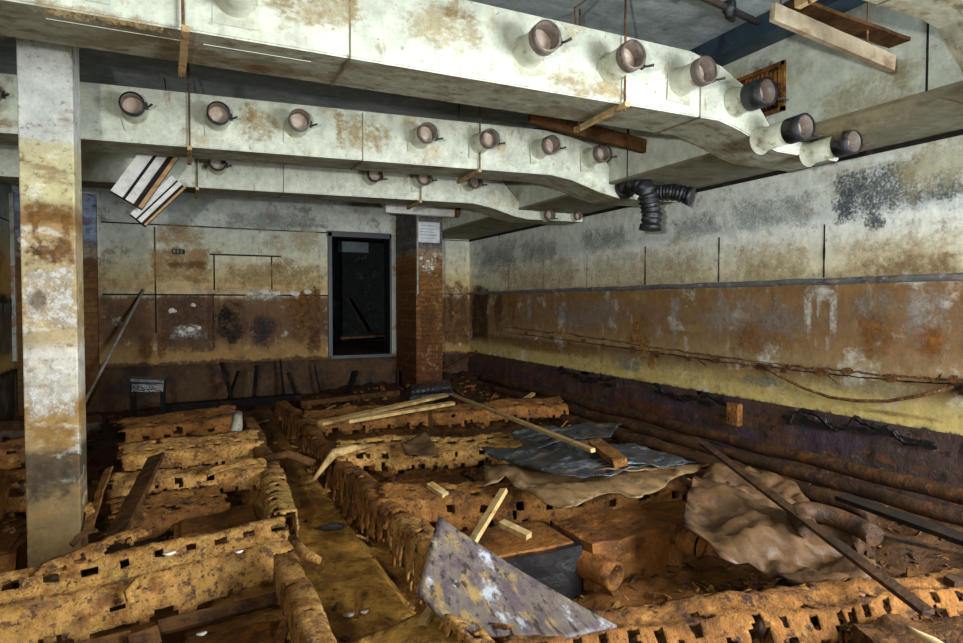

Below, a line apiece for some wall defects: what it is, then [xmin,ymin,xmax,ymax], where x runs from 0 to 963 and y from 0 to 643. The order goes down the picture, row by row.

mould [832,155,963,230]
corrosion [25,203,75,264]
water stain [158,295,275,356]
corrosion [288,287,324,353]